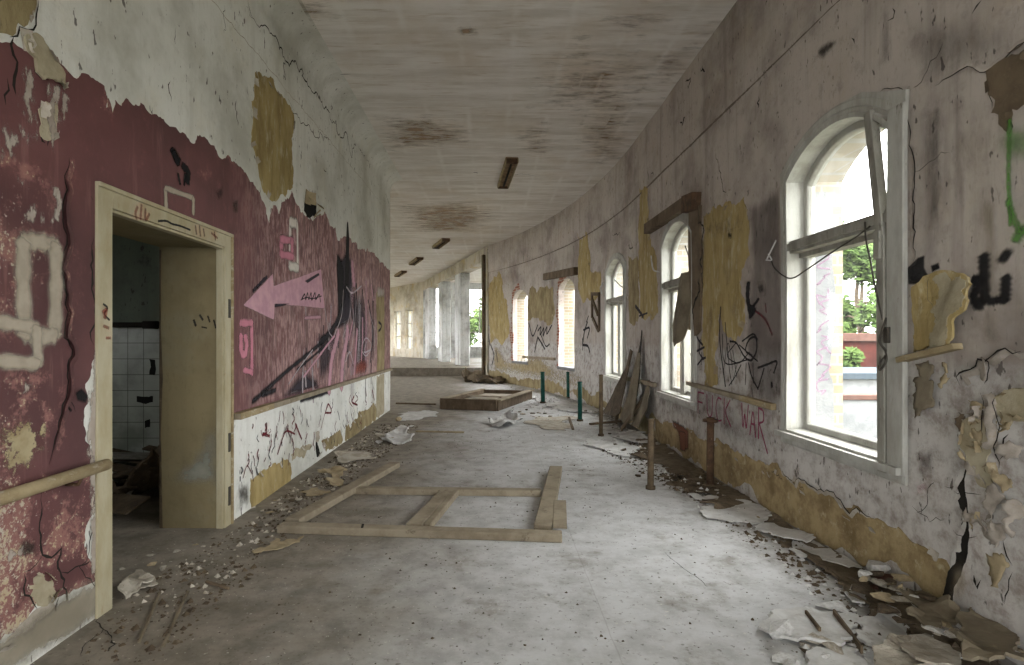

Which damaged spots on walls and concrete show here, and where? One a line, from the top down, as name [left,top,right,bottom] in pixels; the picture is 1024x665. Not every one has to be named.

flaking render [0,0,69,90]
flaking render [251,71,296,202]
crack [223,3,365,156]
crack [907,122,948,262]
flaking render [984,44,1024,132]
crack [23,492,95,608]
crack [41,137,95,466]
flaking render [250,286,385,509]
flaking render [489,232,607,409]
flaking render [701,197,750,387]
flaking render [618,406,950,598]
crack [912,348,1024,604]